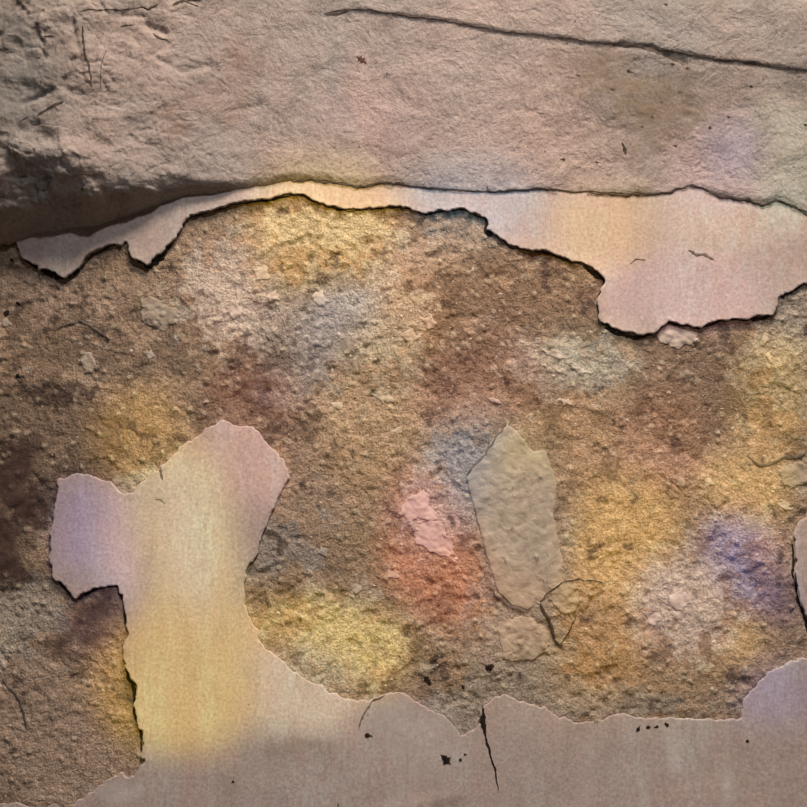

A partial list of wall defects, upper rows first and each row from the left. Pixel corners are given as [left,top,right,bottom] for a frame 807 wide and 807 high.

crack [325,8,807,70]
crack [587,185,807,212]
crack [18,178,770,340]
crack [780,284,807,299]
spalling [0,194,807,807]
crack [488,578,603,646]
crack [791,544,807,632]
crack [479,706,499,791]